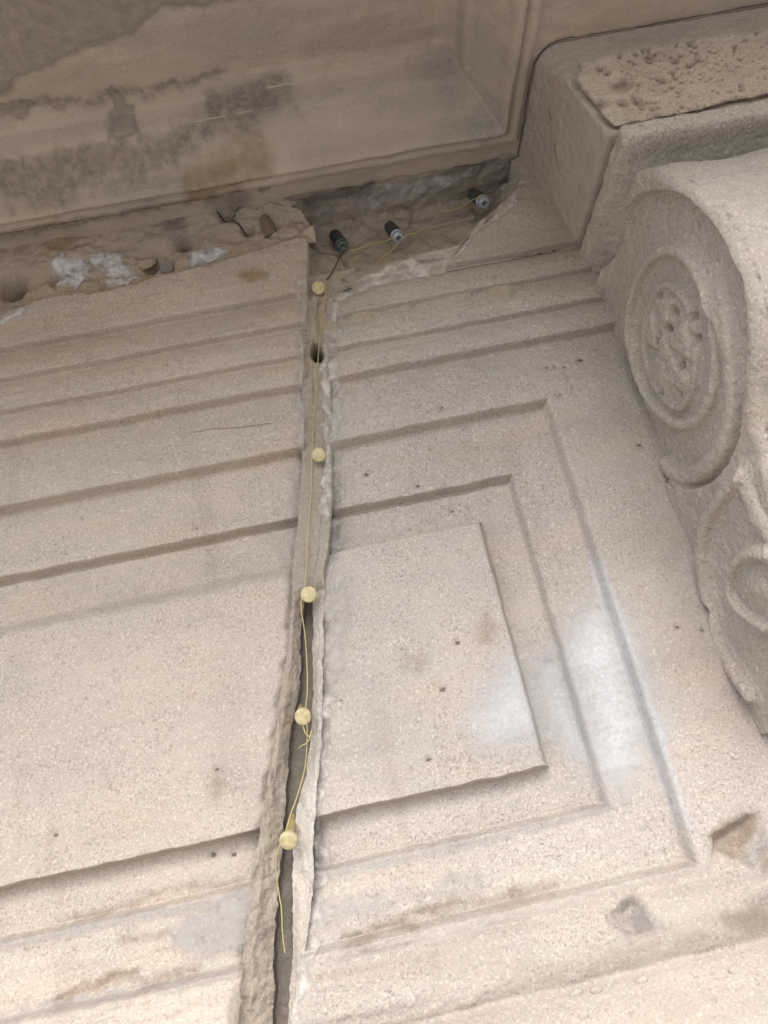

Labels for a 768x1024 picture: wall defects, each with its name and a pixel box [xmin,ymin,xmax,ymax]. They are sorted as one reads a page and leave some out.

water stain [0,77,281,194]
spalling [0,156,530,345]
crack [229,212,560,1024]